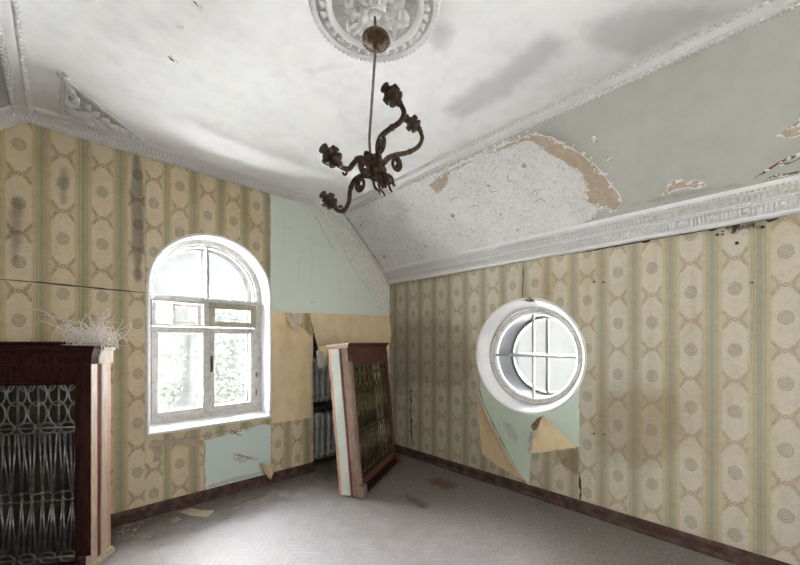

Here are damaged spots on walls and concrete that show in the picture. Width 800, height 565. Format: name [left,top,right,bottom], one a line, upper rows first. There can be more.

peeling [270,131,622,316]
peeling [203,424,277,490]
peeling [480,381,580,484]